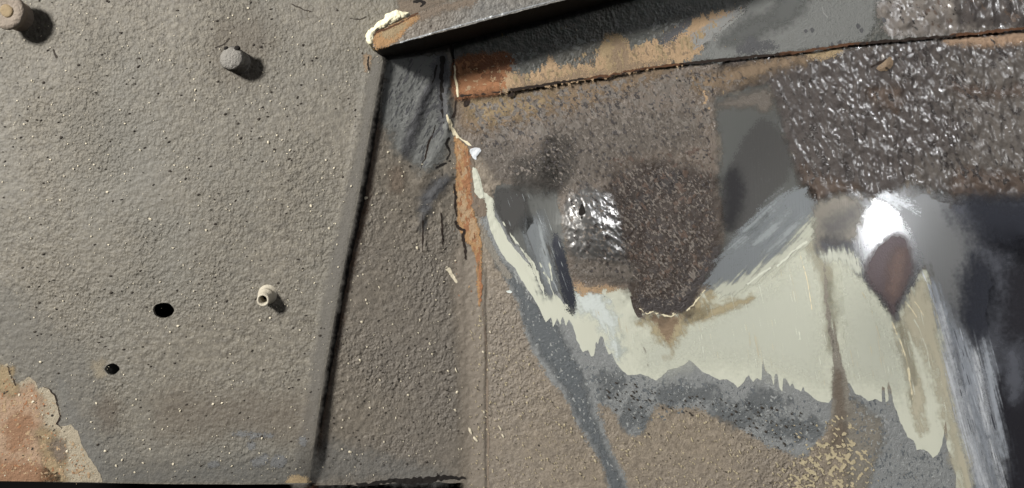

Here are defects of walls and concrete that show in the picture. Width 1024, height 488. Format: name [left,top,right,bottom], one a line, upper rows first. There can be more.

damp [401,51,453,157]
rust [449,1,851,488]